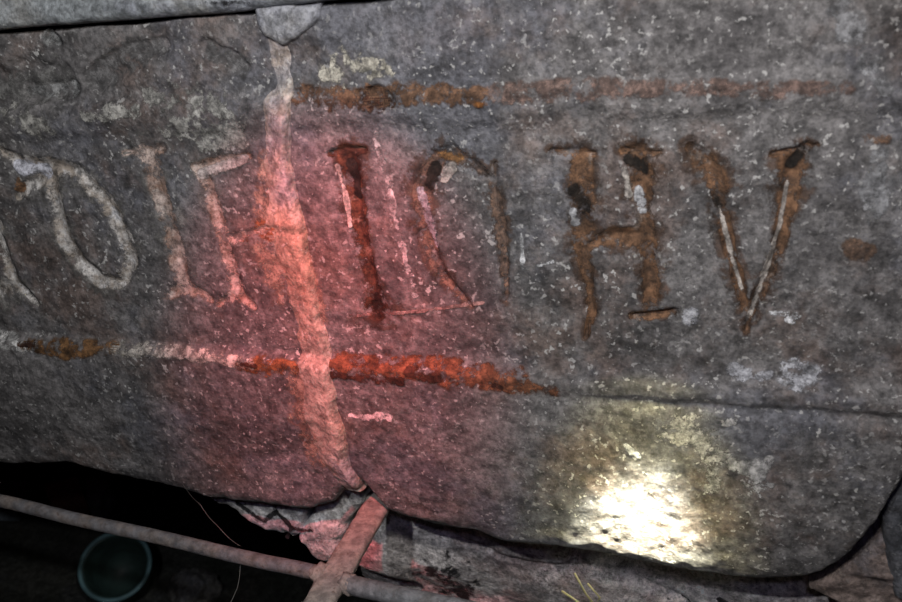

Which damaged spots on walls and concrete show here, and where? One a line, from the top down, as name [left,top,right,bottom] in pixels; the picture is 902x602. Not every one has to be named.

corrosion [291,77,856,113]
crack [211,0,368,492]
corrosion [17,336,120,361]
corrosion [235,355,299,378]
corrosion [329,351,559,397]